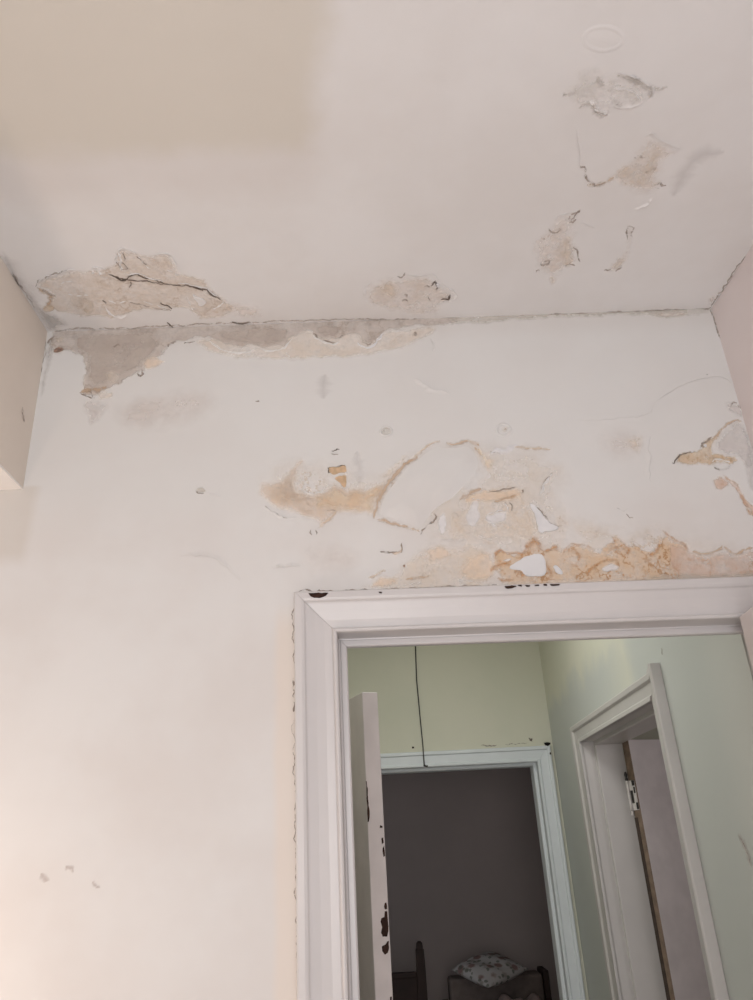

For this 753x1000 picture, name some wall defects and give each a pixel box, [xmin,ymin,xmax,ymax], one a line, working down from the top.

peeling [35,248,458,398]
peeling [328,465,347,487]
peeling [439,487,559,542]
peeling [380,903,389,954]